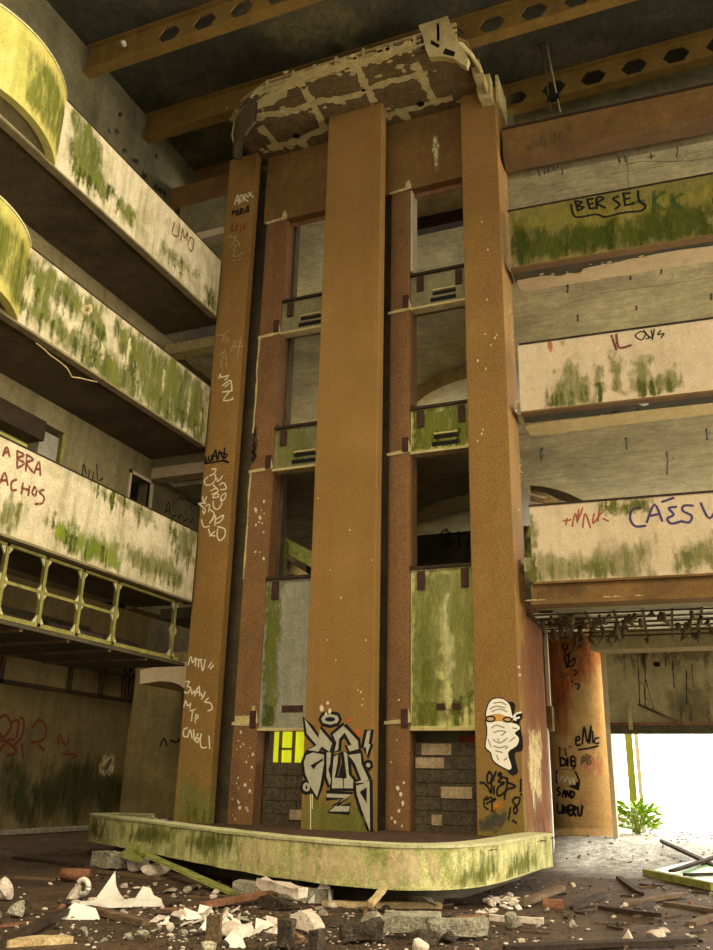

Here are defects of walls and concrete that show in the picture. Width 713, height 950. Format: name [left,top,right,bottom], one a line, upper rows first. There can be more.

peeling [226,37,460,153]
water stain [71,148,119,212]
water stain [161,243,197,276]
water stain [21,259,63,341]
water stain [57,294,119,365]
water stain [548,382,602,406]
water stain [638,381,672,397]
water stain [132,520,190,591]
water stain [419,594,472,726]
corrosion [548,634,599,731]
water stain [1,757,121,828]